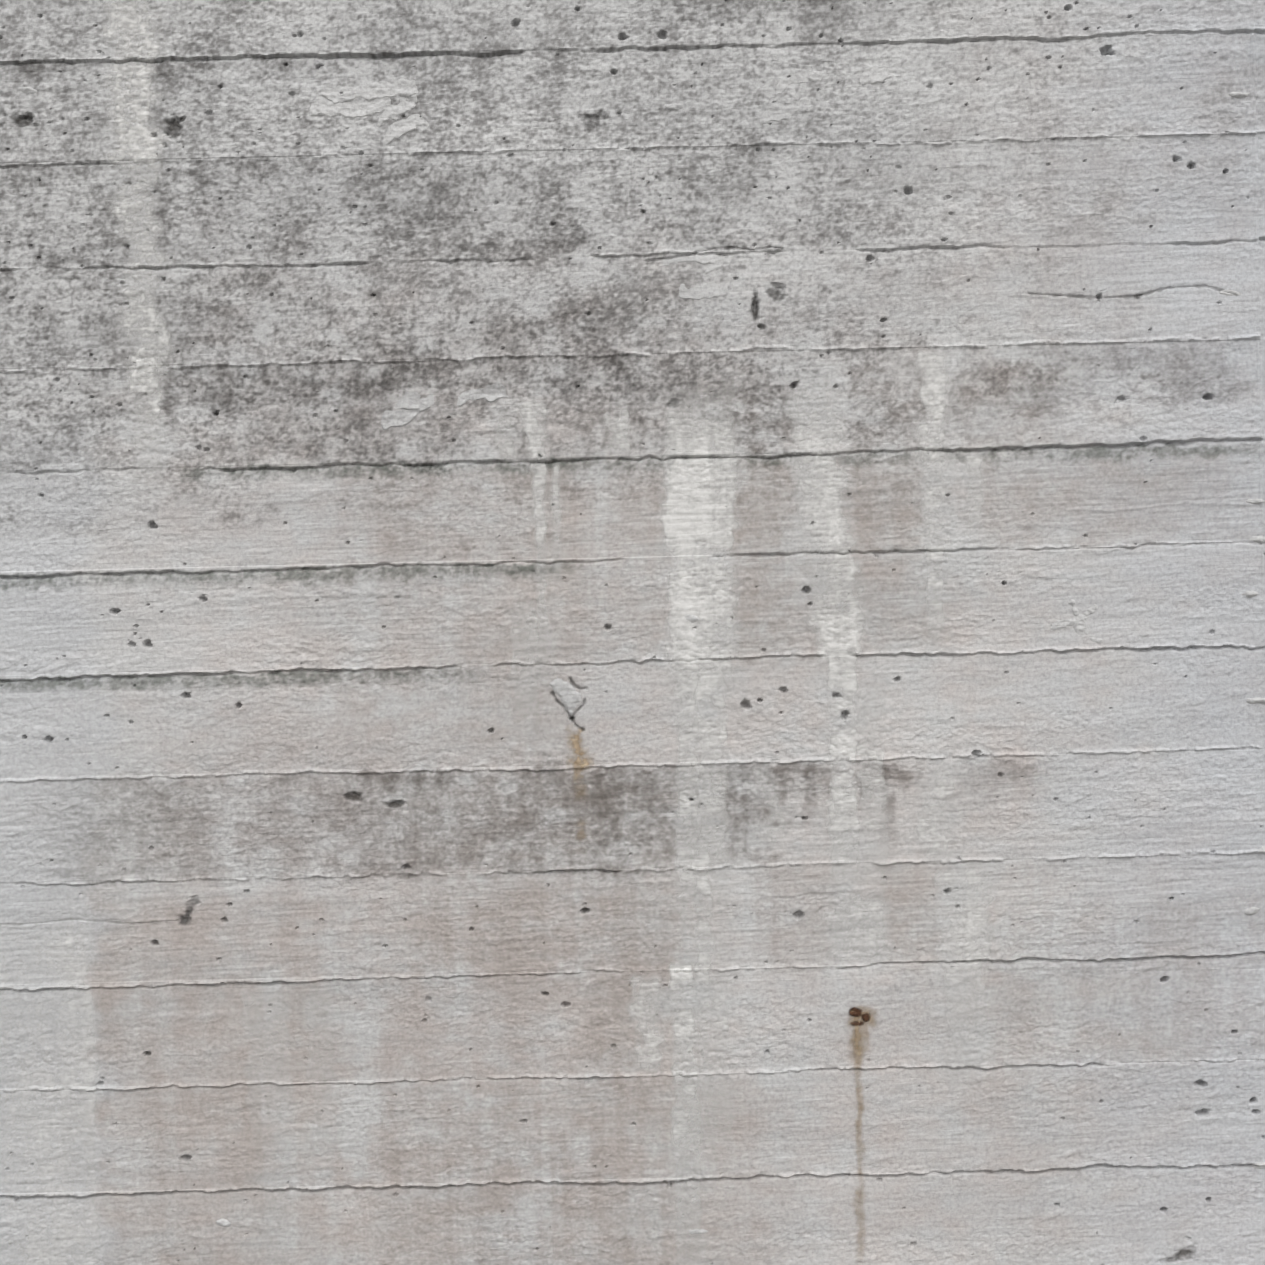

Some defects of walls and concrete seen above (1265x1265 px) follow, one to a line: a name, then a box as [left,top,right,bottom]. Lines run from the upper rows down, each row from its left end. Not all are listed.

damp [519,402,566,547]
damp [938,870,993,989]
corrosion [849,1007,873,1052]